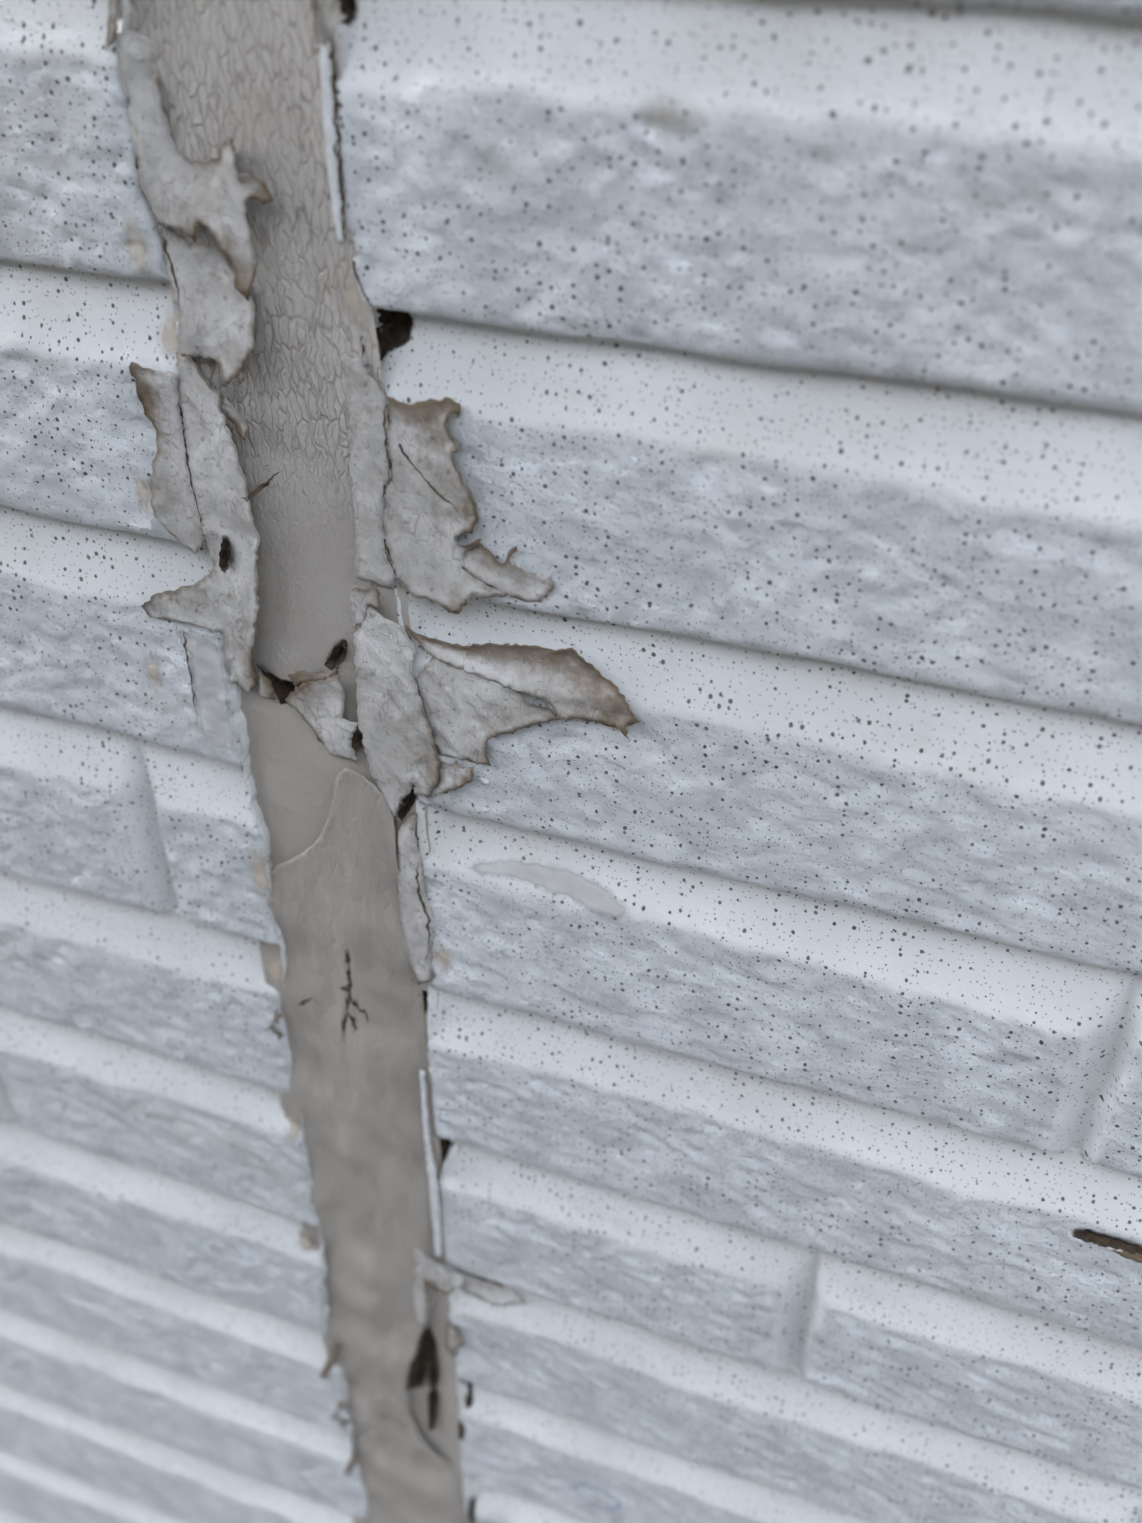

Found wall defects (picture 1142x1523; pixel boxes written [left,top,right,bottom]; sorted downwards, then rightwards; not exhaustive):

peeling [116,30,273,693]
peeling [343,354,554,614]
peeling [353,605,641,817]